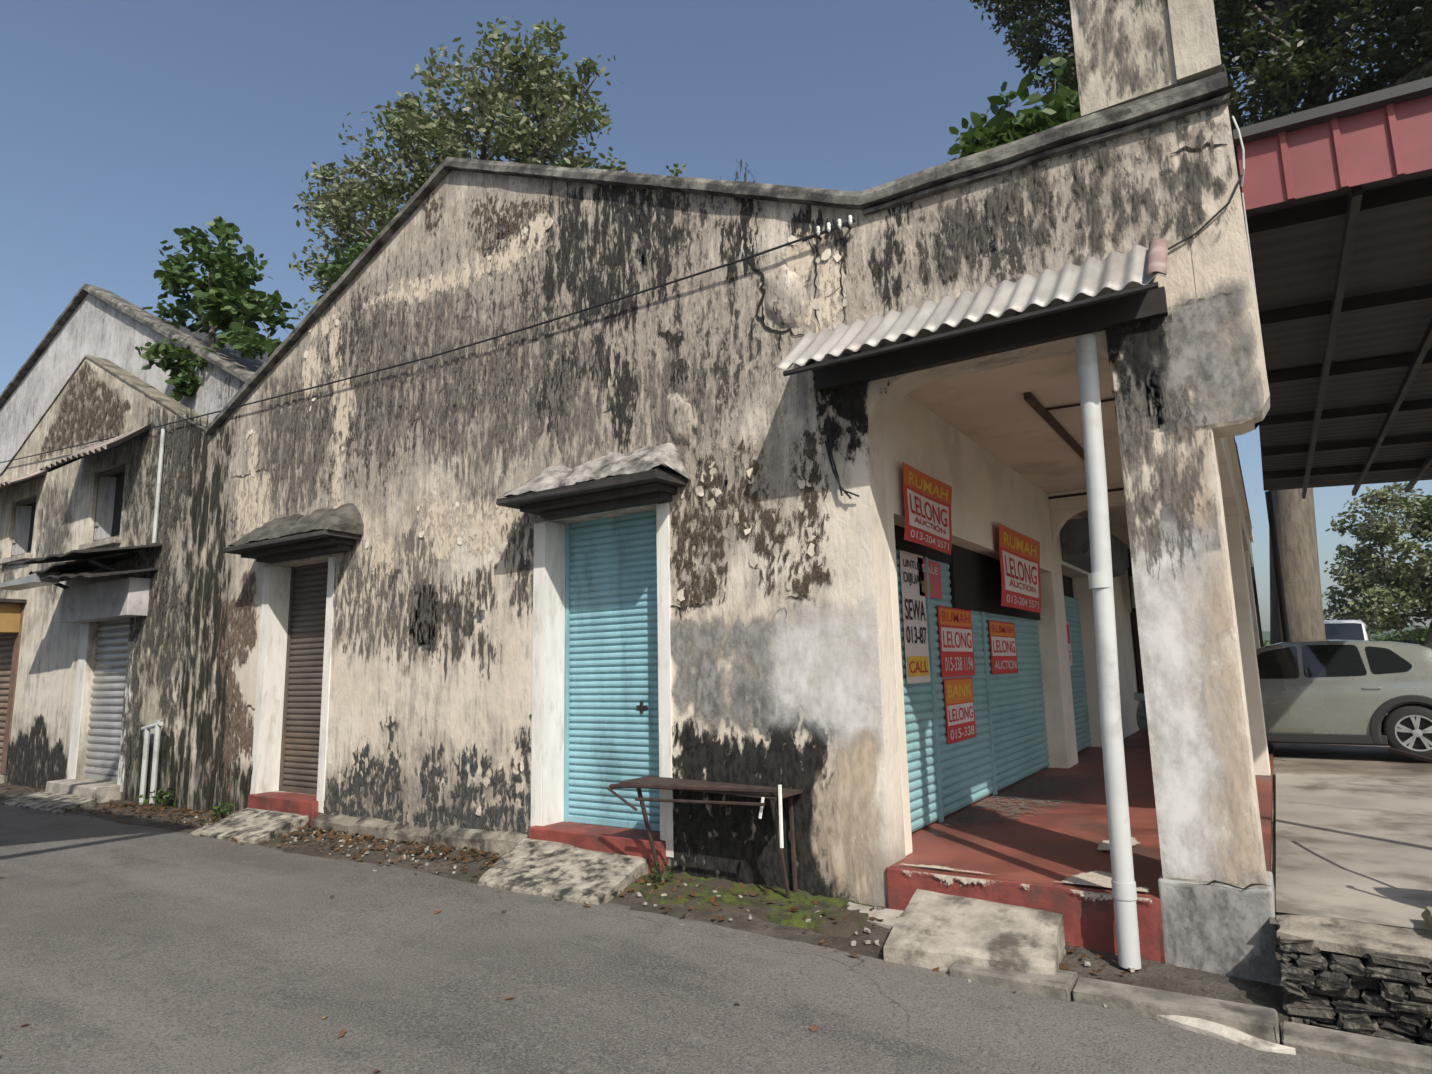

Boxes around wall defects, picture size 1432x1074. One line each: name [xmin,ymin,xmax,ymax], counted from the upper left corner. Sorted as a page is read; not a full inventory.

leakage [349,184,719,512]
crack [741,198,846,351]
peeling [782,229,854,334]
leakage [868,104,1233,314]
crack [1171,142,1228,154]
leakage [1113,361,1214,579]
leakage [119,400,193,808]
leakage [332,511,546,682]
leakage [4,714,67,790]
leakage [660,615,881,903]
peeling [902,864,1001,885]
peeling [1054,870,1113,901]